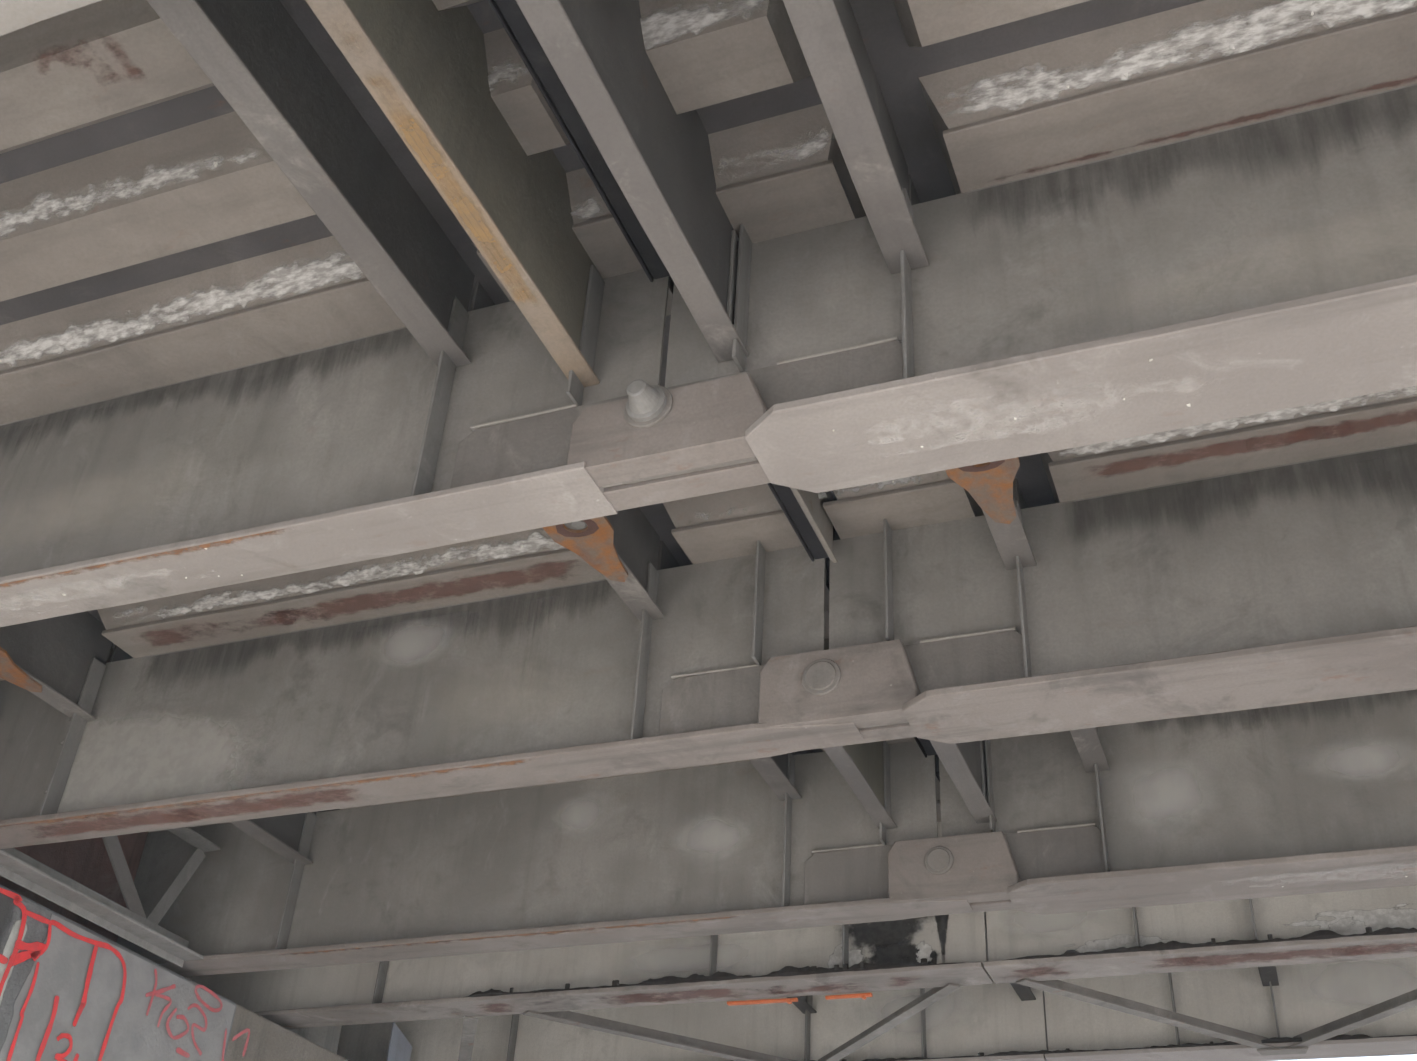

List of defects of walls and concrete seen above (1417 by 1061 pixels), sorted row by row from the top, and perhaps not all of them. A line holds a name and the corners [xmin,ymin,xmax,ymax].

leakage [962,0,1417,111]
efflorescence [0,153,254,236]
corrosion [398,117,530,300]
leakage [0,254,363,365]
efflorescence [1060,386,1417,454]
corrosion [1099,410,1417,475]
corrosion [556,519,599,537]
leakage [125,532,564,619]
corrosion [259,562,572,625]
corrosion [3,760,523,838]
leakage [869,914,949,965]
corrosion [1157,944,1417,967]